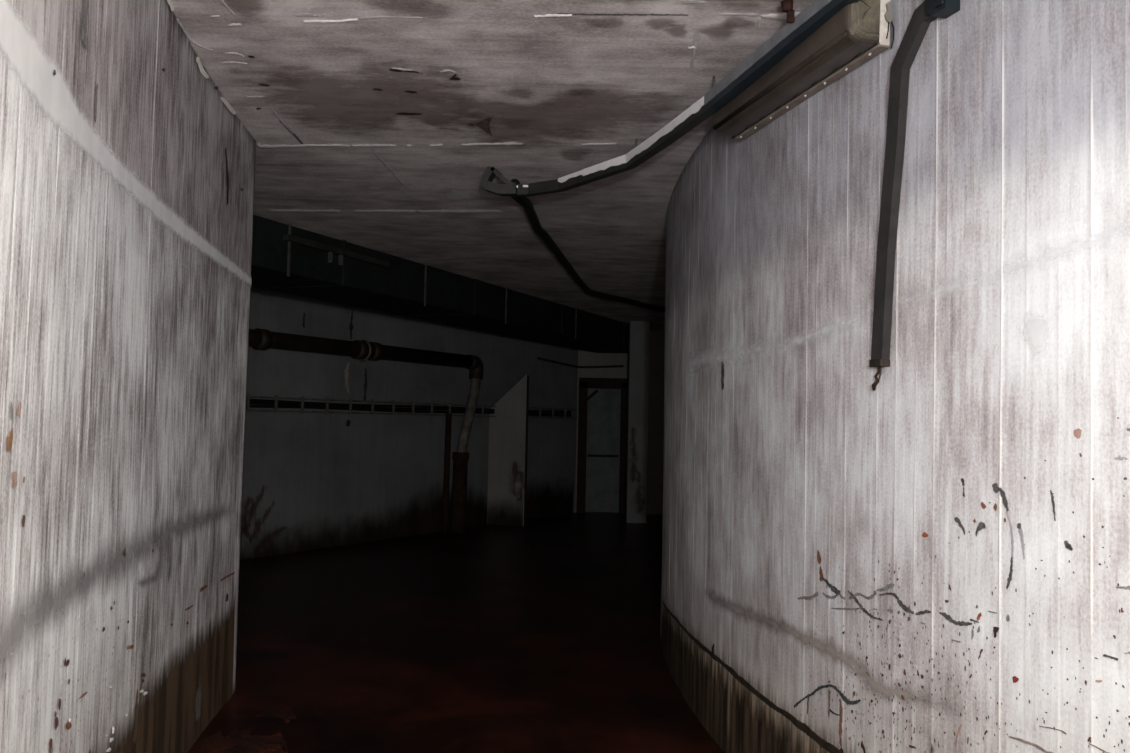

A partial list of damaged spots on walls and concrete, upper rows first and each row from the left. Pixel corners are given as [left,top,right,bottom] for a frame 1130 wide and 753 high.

damp [249,63,668,142]
damp [109,604,235,753]
damp [661,607,855,753]
crack [662,601,866,753]